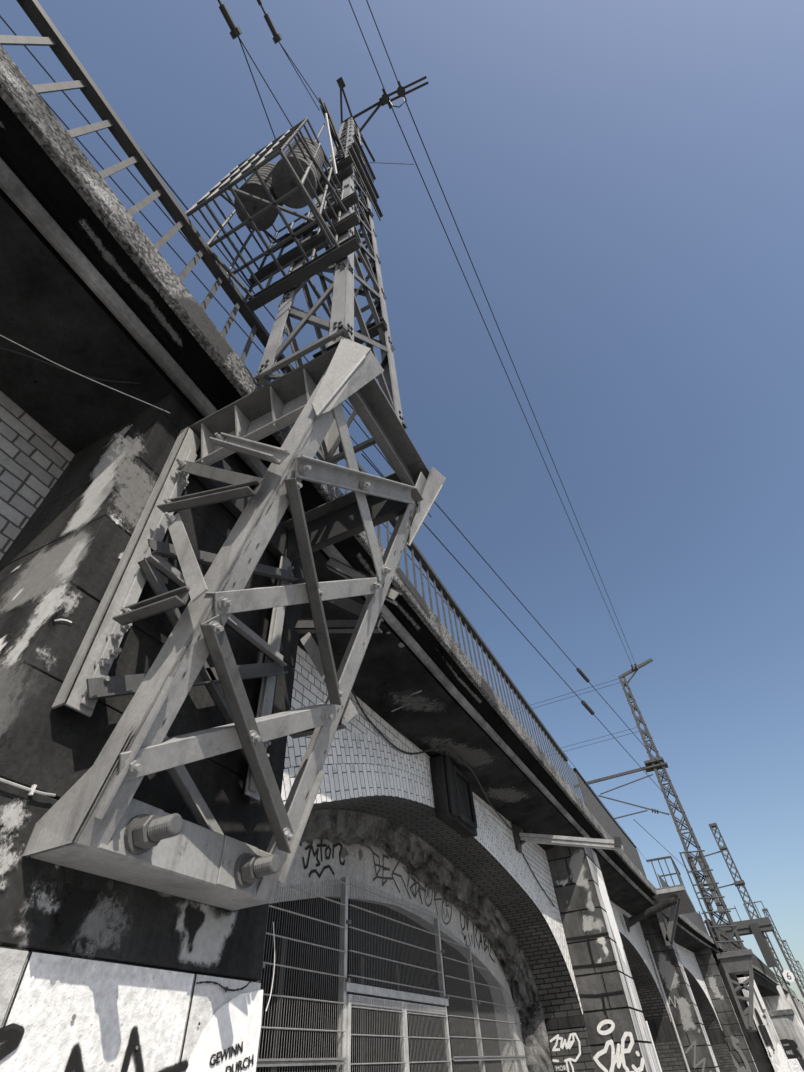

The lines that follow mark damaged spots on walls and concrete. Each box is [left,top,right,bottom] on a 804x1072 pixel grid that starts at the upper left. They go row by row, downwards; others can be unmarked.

peeling [0,801,30,889]
peeling [27,887,59,912]
spalling [299,810,554,1072]
peeling [569,849,604,932]